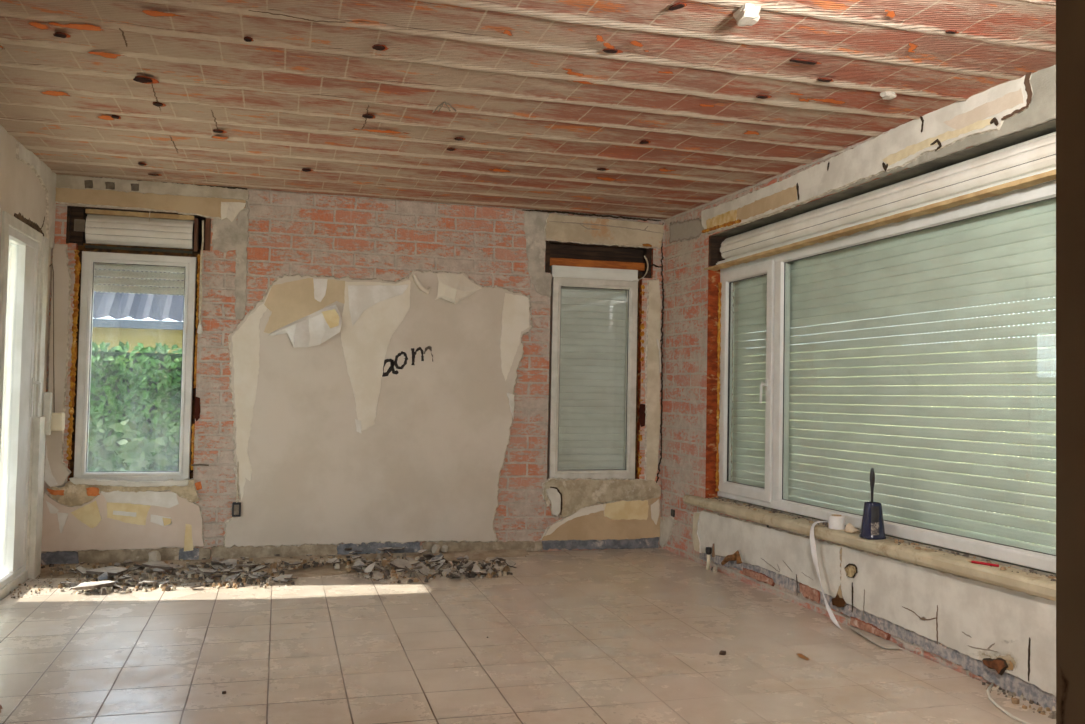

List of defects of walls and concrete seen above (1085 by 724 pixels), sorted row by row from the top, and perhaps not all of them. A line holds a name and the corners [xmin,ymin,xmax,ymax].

spalling [28,22,104,32]
flaking render [701,73,1033,234]
peeling [500,293,529,419]
peeling [232,278,409,501]
spalling [44,440,202,533]
spalling [542,478,661,536]
spalling [844,563,858,578]
flaking render [799,583,820,604]
flaking render [850,617,891,640]
crack [902,605,995,649]
crack [1025,637,1033,681]